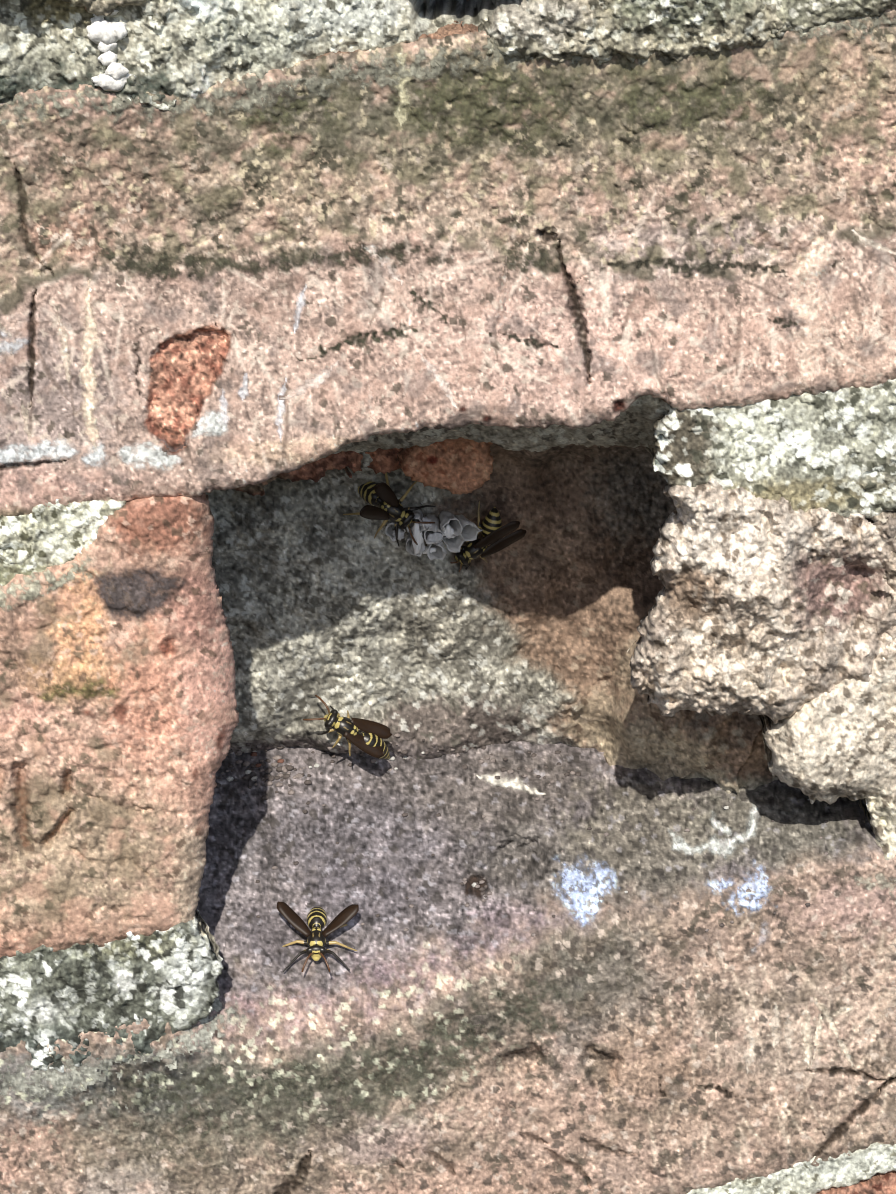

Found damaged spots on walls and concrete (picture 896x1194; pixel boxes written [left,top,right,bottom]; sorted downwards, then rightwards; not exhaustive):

water stain [86,10,136,92]
crack [15,168,43,407]
crack [489,230,787,383]
crack [768,317,798,328]
spalling [161,641,175,653]
spalling [114,705,127,720]
spalling [465,875,488,899]
crack [700,1085,743,1098]
crack [808,1068,896,1156]